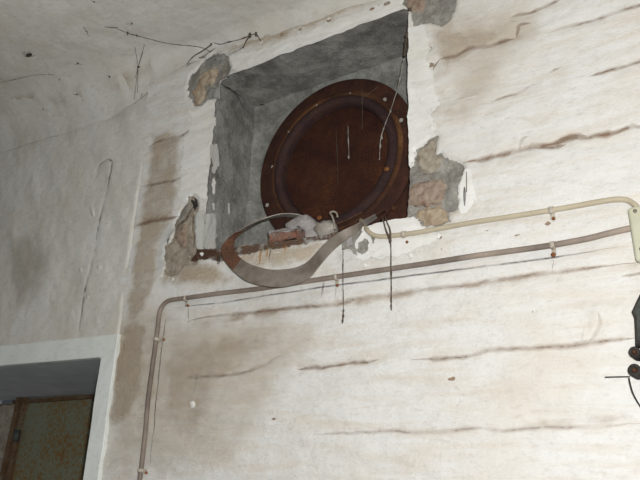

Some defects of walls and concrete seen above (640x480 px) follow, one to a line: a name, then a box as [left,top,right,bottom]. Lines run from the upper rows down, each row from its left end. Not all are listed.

flaking render [157,0,476,282]
crack [541,127,629,148]
water stain [132,134,175,310]
corrosion [234,232,339,264]
water stain [113,328,139,418]